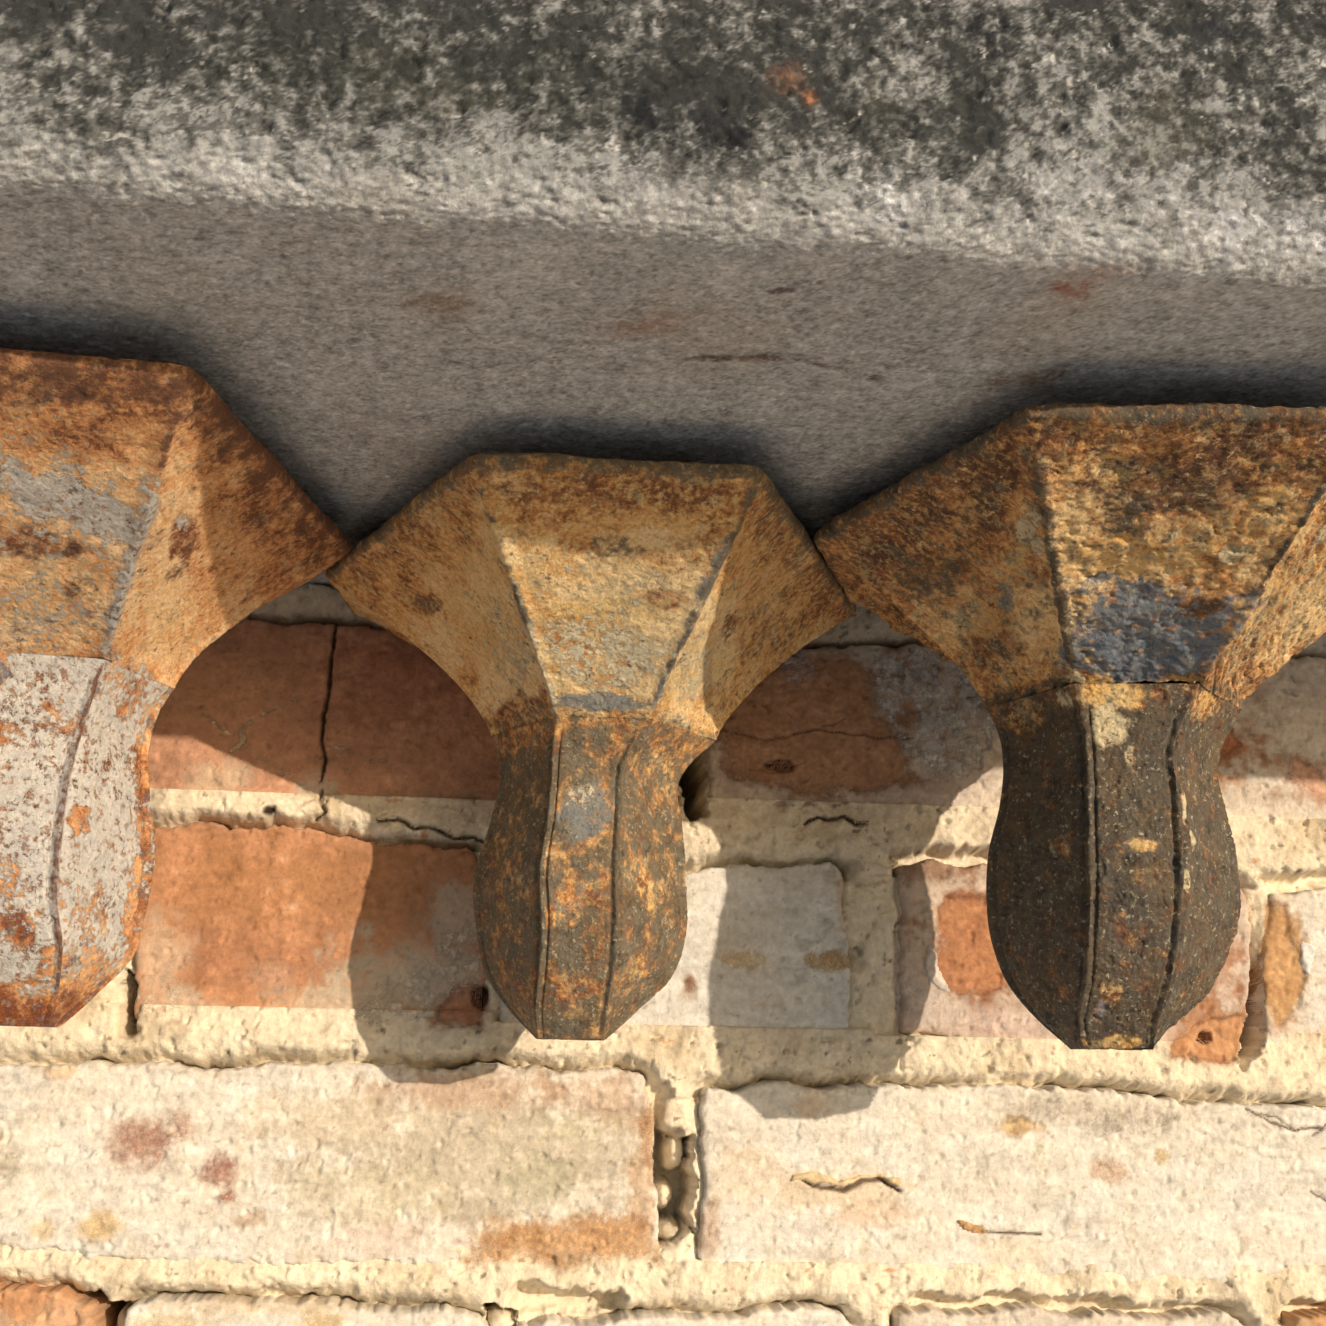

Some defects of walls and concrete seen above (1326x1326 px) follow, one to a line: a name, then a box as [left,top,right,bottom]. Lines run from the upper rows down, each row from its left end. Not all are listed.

crack [318,625,337,819]
rust [805,951,851,970]